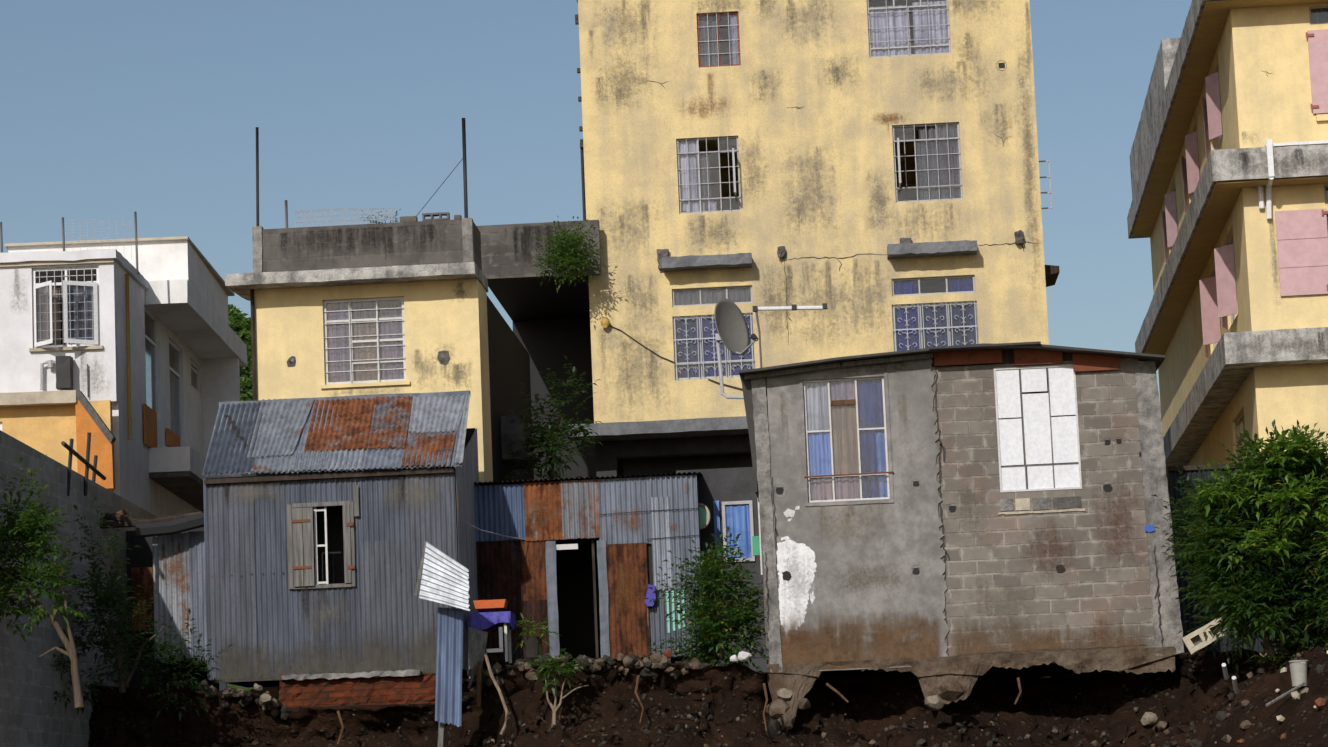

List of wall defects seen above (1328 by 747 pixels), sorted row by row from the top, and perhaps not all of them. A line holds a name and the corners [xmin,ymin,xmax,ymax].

leakage [309,225,433,248]
peeling [773,484,817,630]
crack [935,366,1165,656]